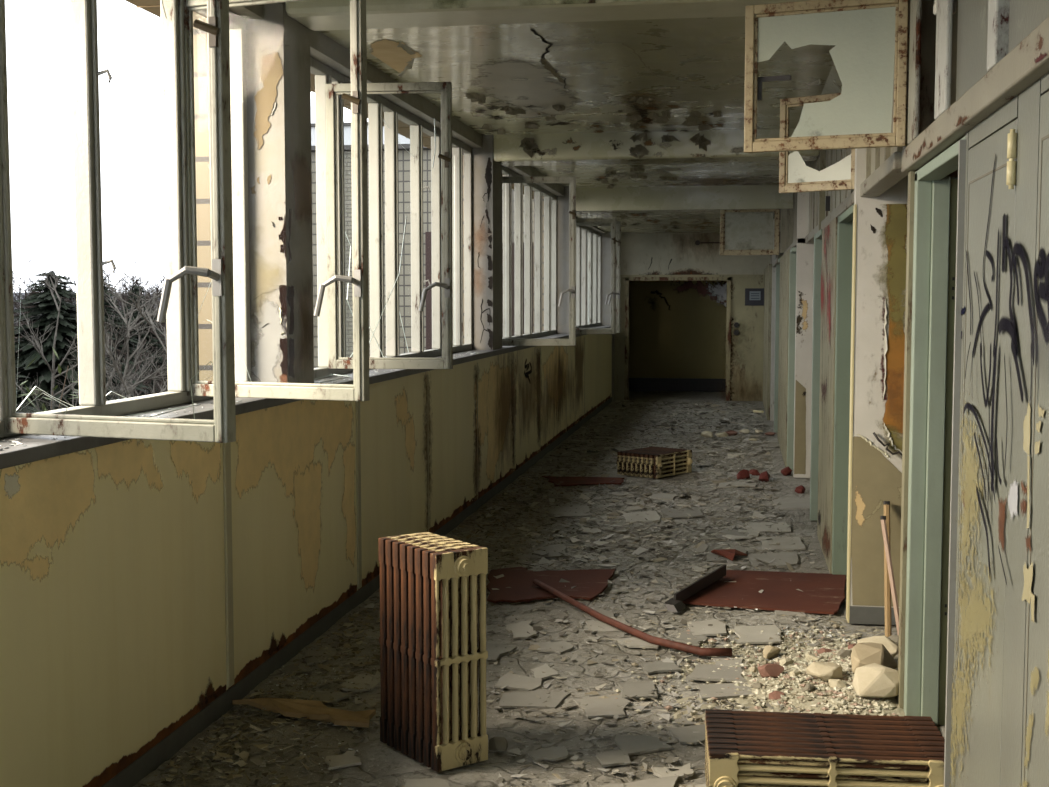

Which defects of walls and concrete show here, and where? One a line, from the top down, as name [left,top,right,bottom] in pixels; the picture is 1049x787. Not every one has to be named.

peeling [254,52,283,150]
peeling [370,39,421,77]
crack [513,29,615,93]
peeling [0,439,163,582]
peeling [170,441,221,502]
peeling [235,400,356,591]
damp [496,344,583,449]
peeling [851,204,908,607]
peeling [1023,402,1045,528]
peeling [1022,563,1035,622]
corrosion [83,562,380,787]
peeling [1020,651,1049,787]